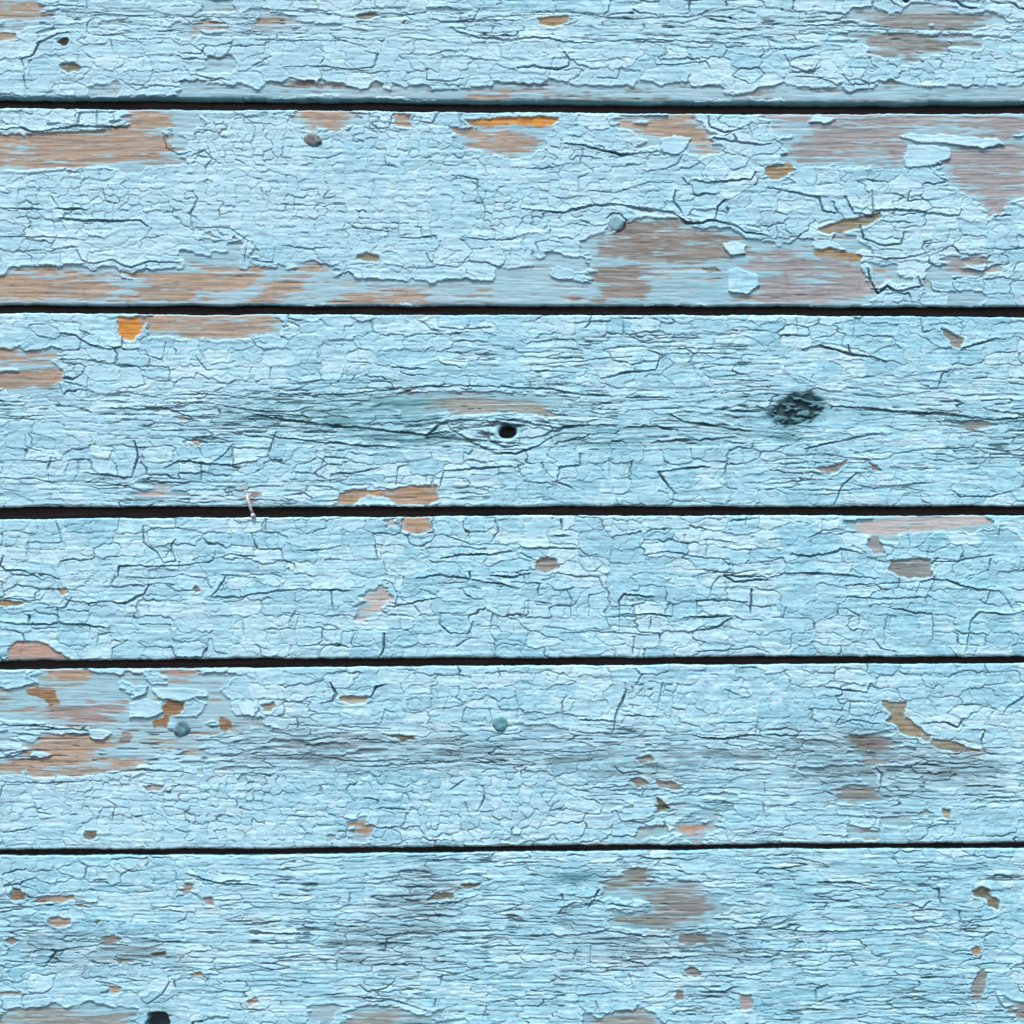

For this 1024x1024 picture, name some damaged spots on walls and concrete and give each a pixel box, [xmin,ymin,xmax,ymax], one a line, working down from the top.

peeling [723,241,746,255]
peeling [811,208,885,263]
peeling [701,265,760,295]